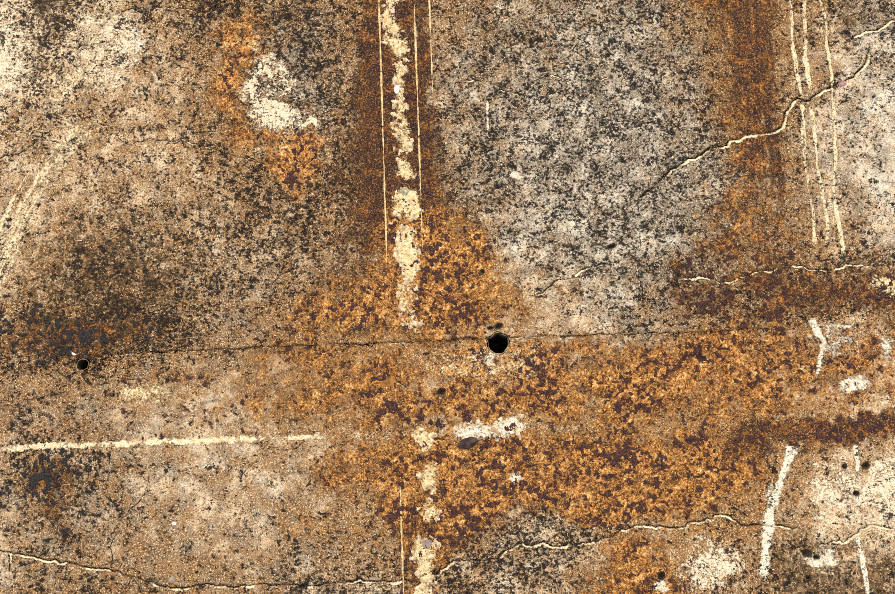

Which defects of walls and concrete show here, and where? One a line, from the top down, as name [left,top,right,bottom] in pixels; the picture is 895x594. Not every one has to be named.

crack [639,21,893,198]
water stain [789,0,846,259]
crack [122,337,465,356]
corrosion [204,0,895,594]
crack [539,219,634,295]
crack [509,327,774,339]
crack [683,256,879,284]
corrosion [113,358,235,431]
crack [0,476,795,594]
water stain [751,445,895,594]
crack [815,524,895,547]